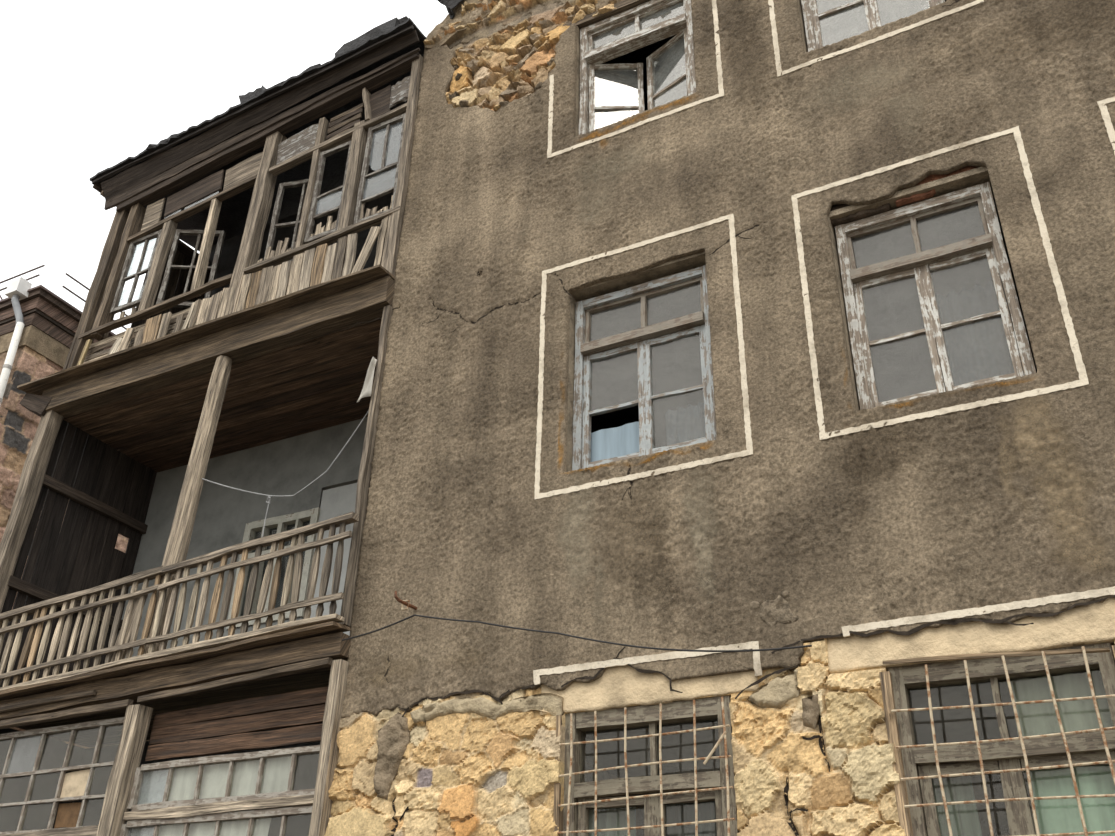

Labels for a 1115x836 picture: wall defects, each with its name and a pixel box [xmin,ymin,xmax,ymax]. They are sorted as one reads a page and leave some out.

flaking render [449,64,469,107]
flaking render [830,166,978,227]
crack [422,273,574,336]
flaking render [410,693,564,724]
crack [802,714,830,772]
crack [391,797,409,836]
crack [784,776,808,836]